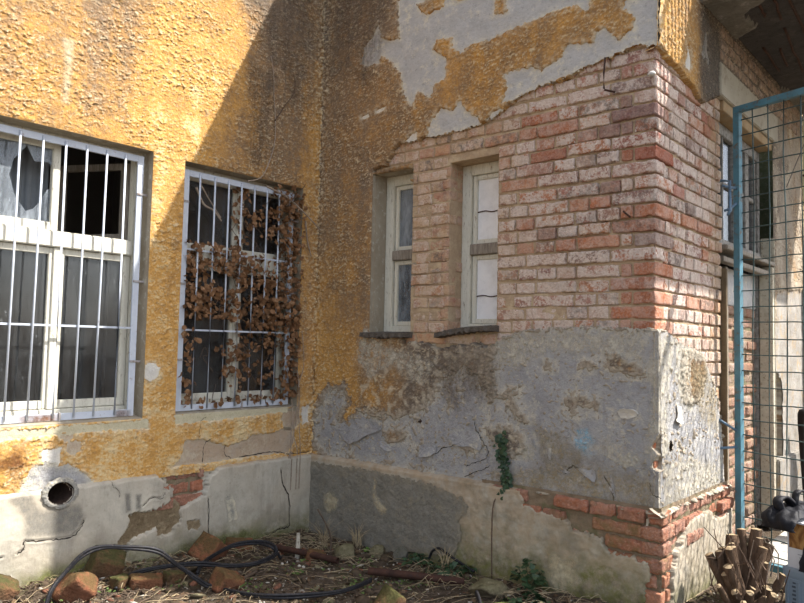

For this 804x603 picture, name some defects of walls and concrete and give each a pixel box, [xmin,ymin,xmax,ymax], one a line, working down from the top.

crack [654,0,662,41]
flaking render [301,0,734,603]
crack [0,520,84,558]
peeling [51,427,294,603]